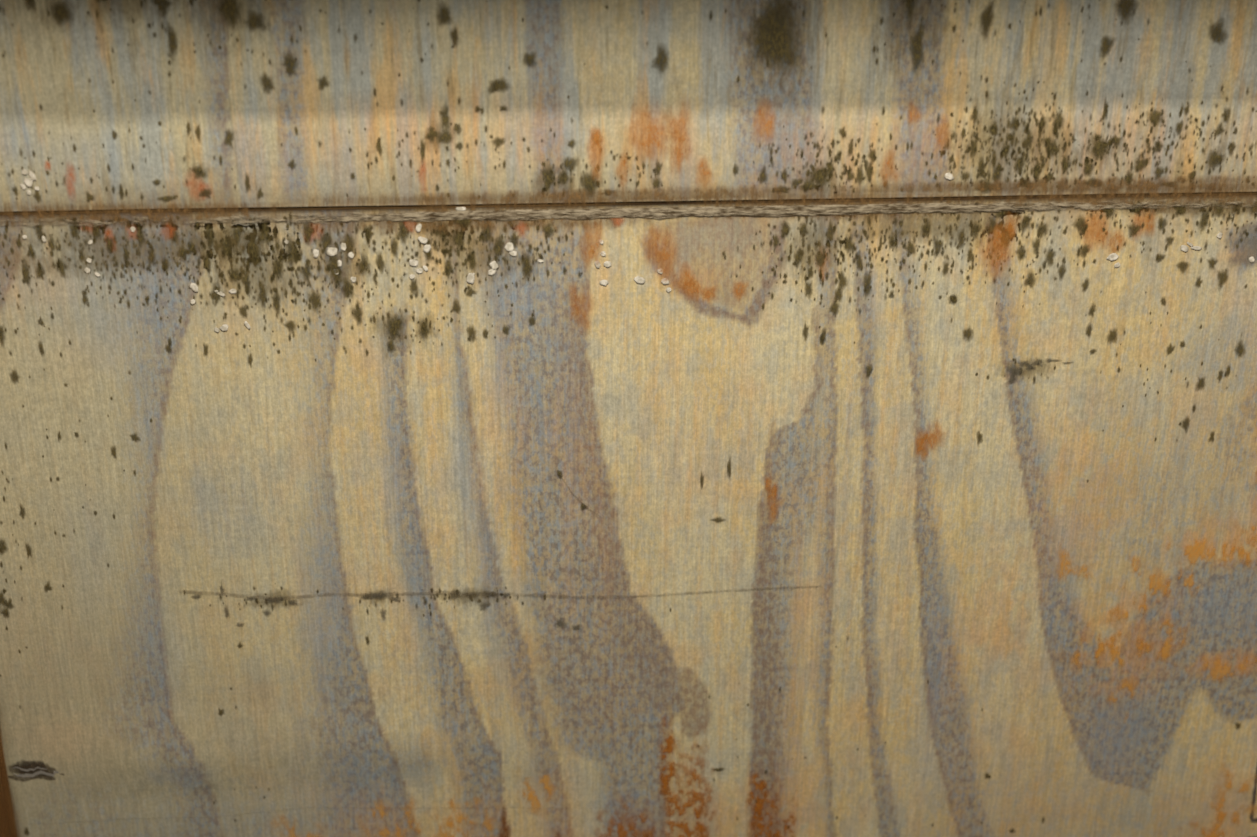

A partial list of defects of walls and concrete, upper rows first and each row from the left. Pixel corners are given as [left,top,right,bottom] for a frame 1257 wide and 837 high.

water stain [132,0,177,76]
water stain [220,0,302,92]
water stain [428,7,458,48]
water stain [490,67,510,92]
water stain [655,48,668,71]
water stain [982,3,1021,34]
water stain [0,76,1257,355]
water stain [1185,343,1244,389]
water stain [0,541,31,630]
rust [1117,527,1254,618]
rust [660,736,710,837]
rust [749,774,795,837]